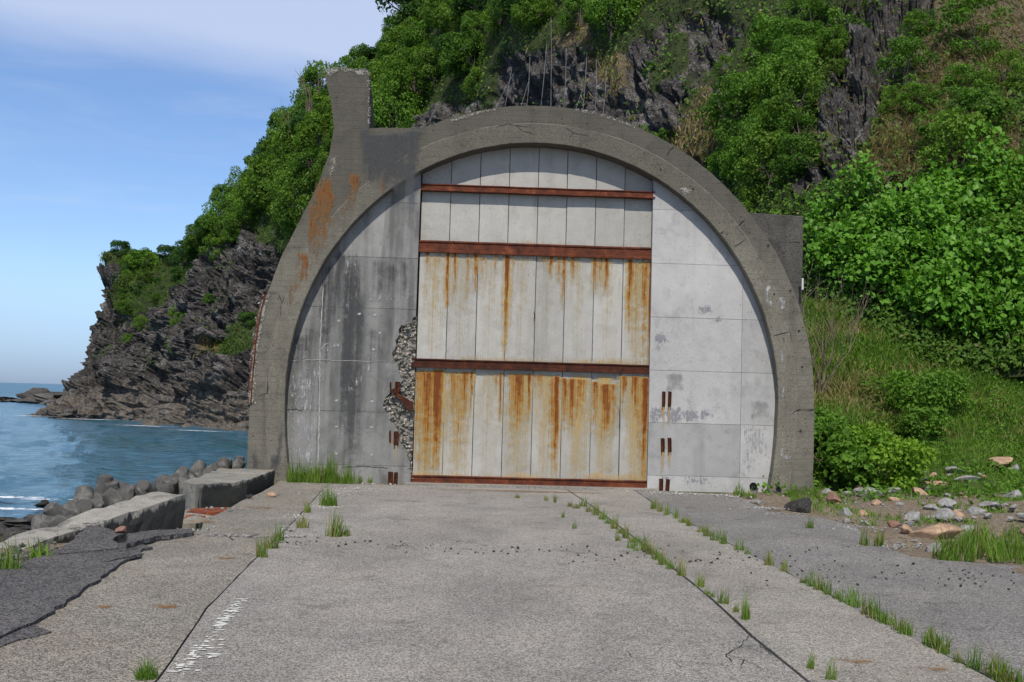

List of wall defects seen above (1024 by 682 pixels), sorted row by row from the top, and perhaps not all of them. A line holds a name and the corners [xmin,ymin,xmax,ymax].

rust [309,174,359,243]
leakage [271,336,321,469]
leakage [321,253,411,448]
spalling [345,317,417,479]
rust [414,252,651,481]